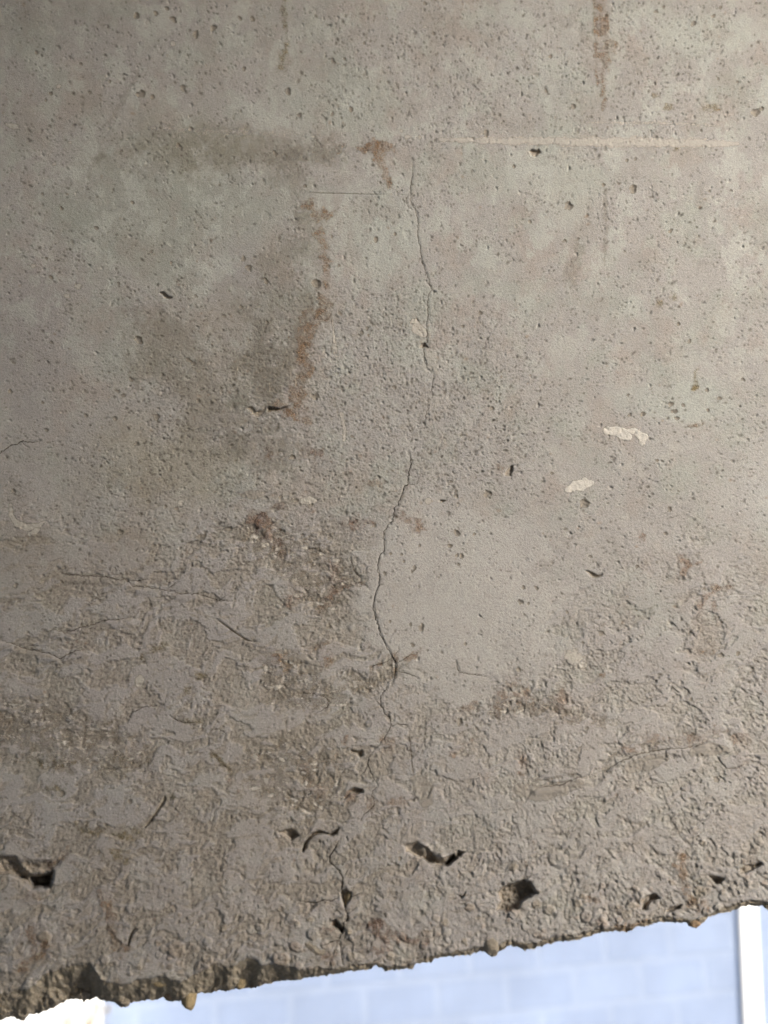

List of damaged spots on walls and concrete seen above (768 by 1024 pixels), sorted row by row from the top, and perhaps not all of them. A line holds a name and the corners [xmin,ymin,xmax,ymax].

corrosion [276,201,332,422]
crack [406,170,434,425]
crack [348,454,415,818]
spalling [0,900,768,1021]